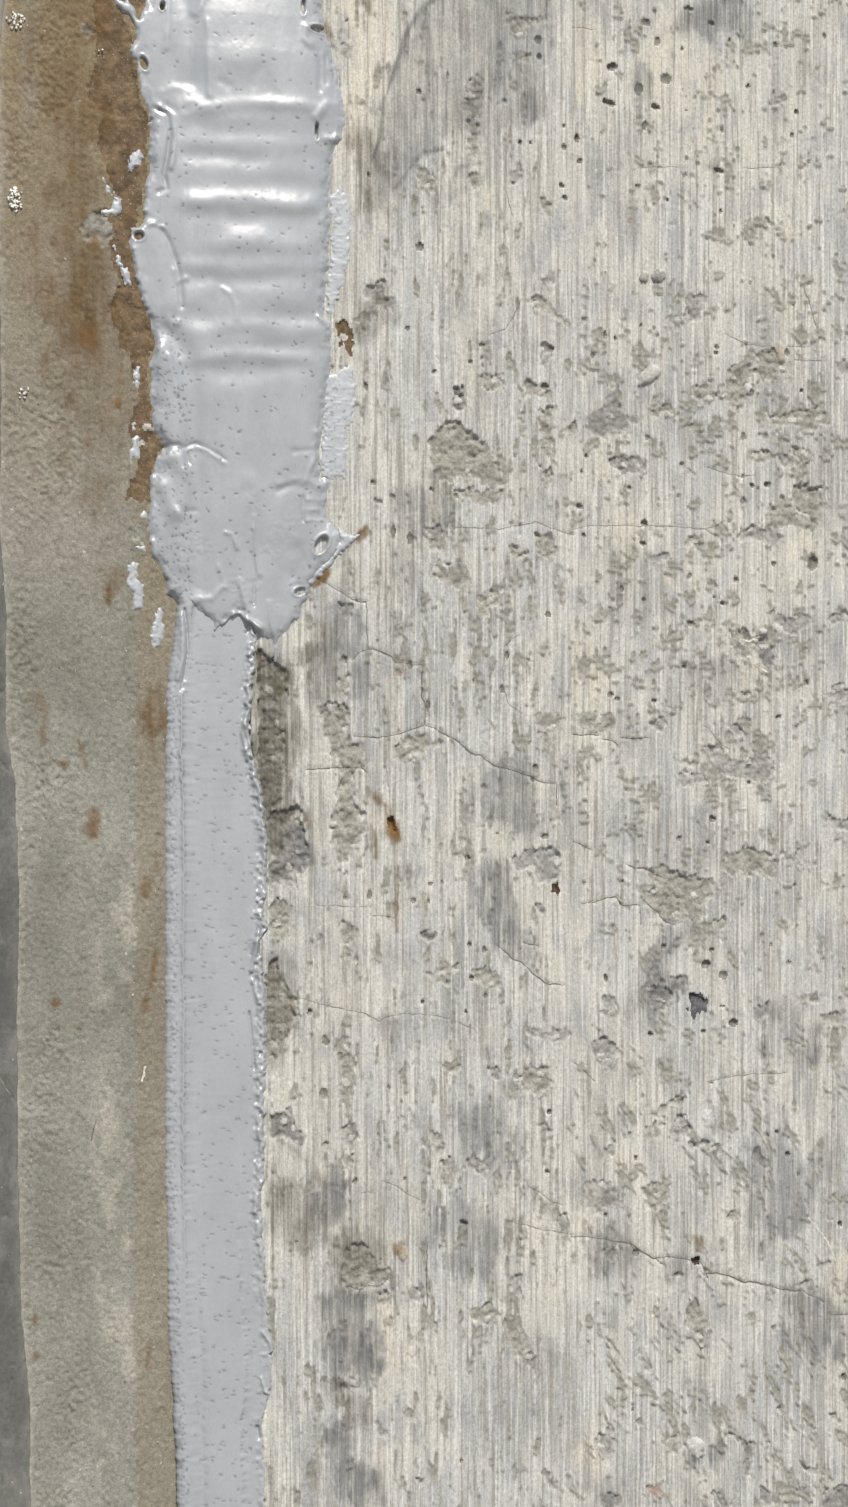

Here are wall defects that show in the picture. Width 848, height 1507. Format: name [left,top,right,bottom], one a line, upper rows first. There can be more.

crack [306,581,557,806]
corrosion [387,822,400,841]
crack [508,1186,847,1315]